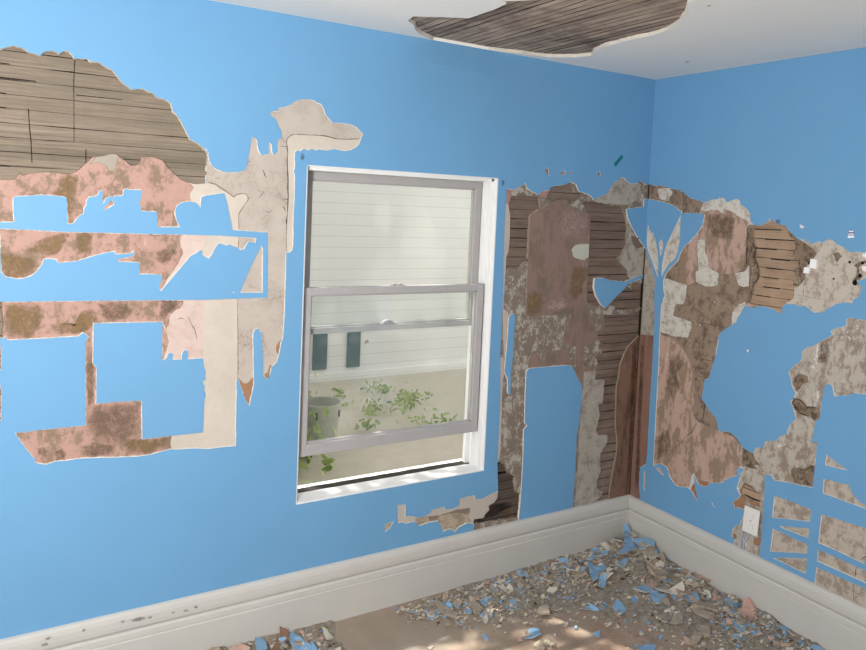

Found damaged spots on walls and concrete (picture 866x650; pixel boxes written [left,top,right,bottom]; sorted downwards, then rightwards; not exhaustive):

spalling [408,0,693,57]
peeling [0,99,363,465]
peeling [385,170,866,607]